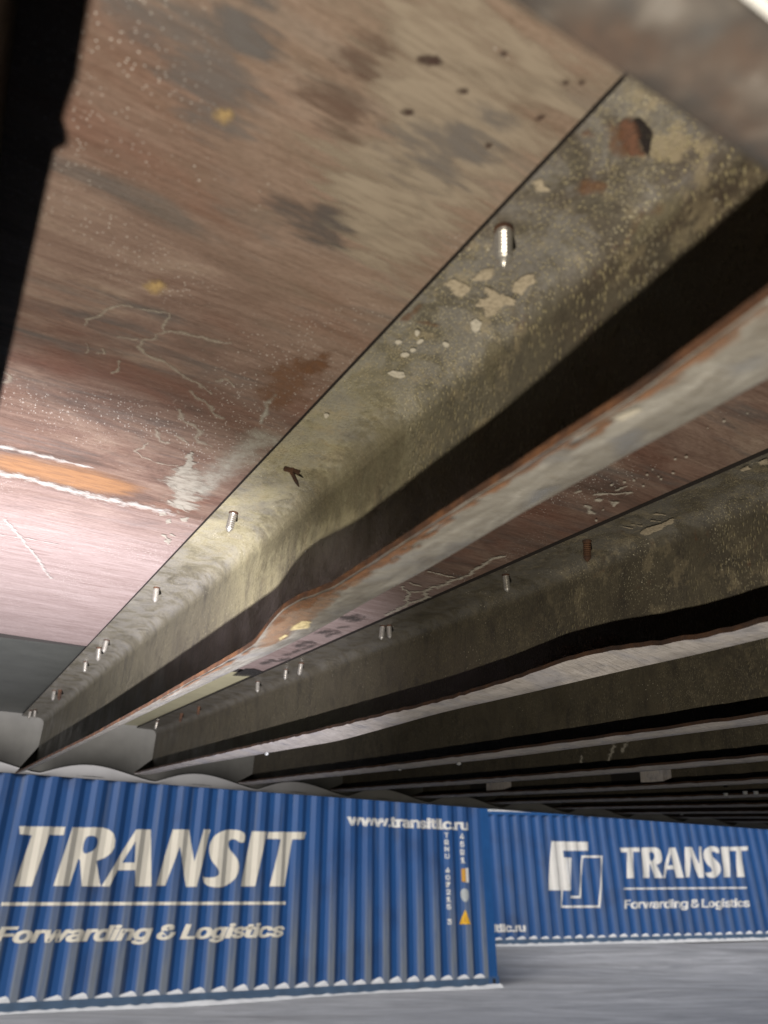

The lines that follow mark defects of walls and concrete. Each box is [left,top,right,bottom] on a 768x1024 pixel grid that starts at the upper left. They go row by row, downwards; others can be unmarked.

damp [279,0,592,273]
corrosion [618,119,645,156]
peeling [532,179,550,192]
peeling [443,268,535,318]
damp [0,410,214,545]
corrosion [162,307,766,700]
peeling [625,514,674,535]